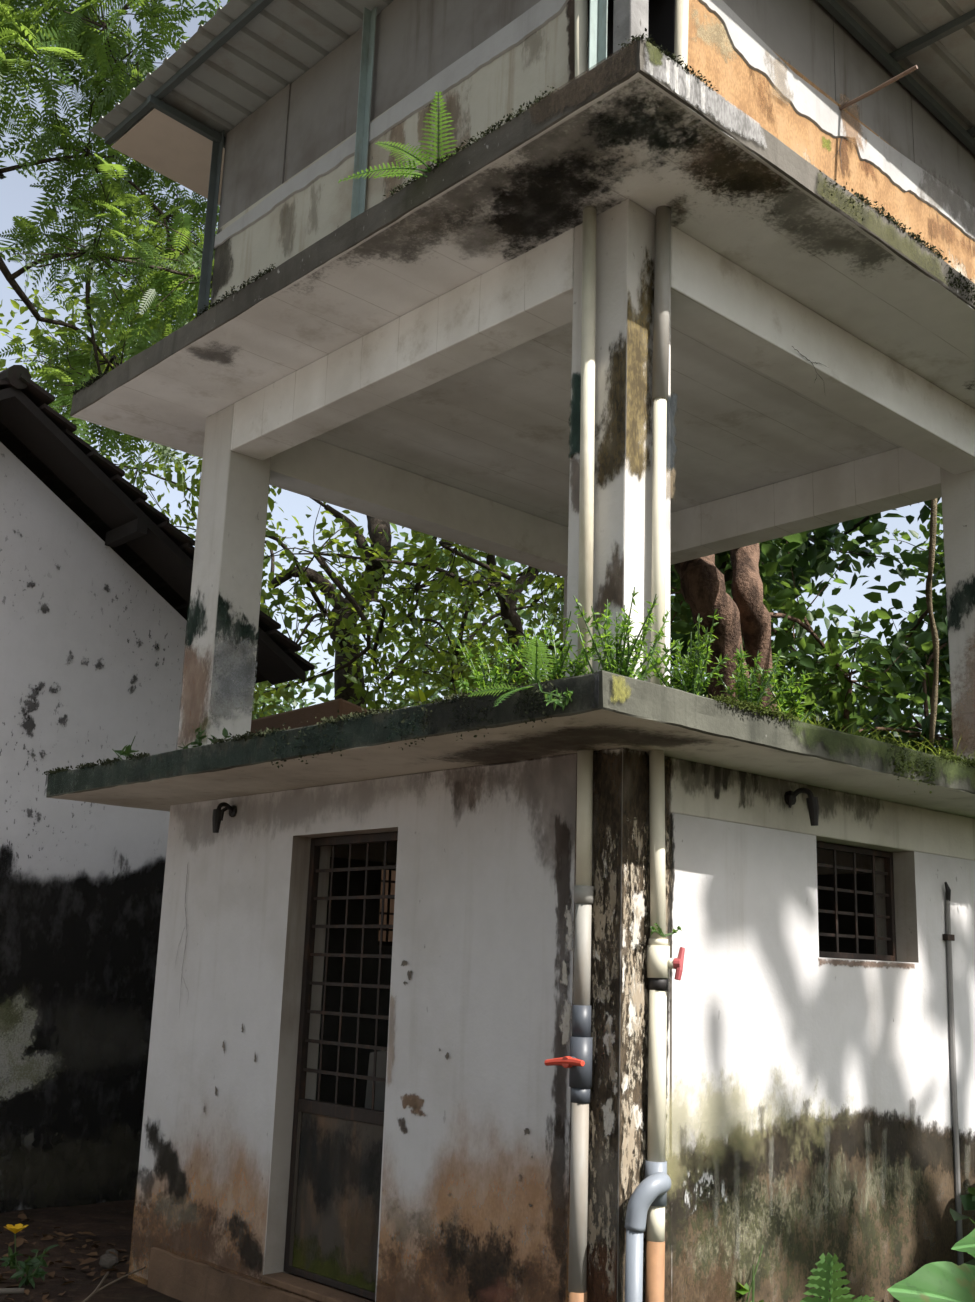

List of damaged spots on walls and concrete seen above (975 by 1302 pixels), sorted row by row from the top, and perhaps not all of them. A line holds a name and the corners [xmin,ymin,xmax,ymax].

damp [339,47,894,266]
damp [0,845,189,1213]
peeling [560,905,574,1044]
peeling [587,820,669,1291]
damp [431,726,880,1302]
damp [225,1215,263,1273]
damp [664,1108,975,1302]